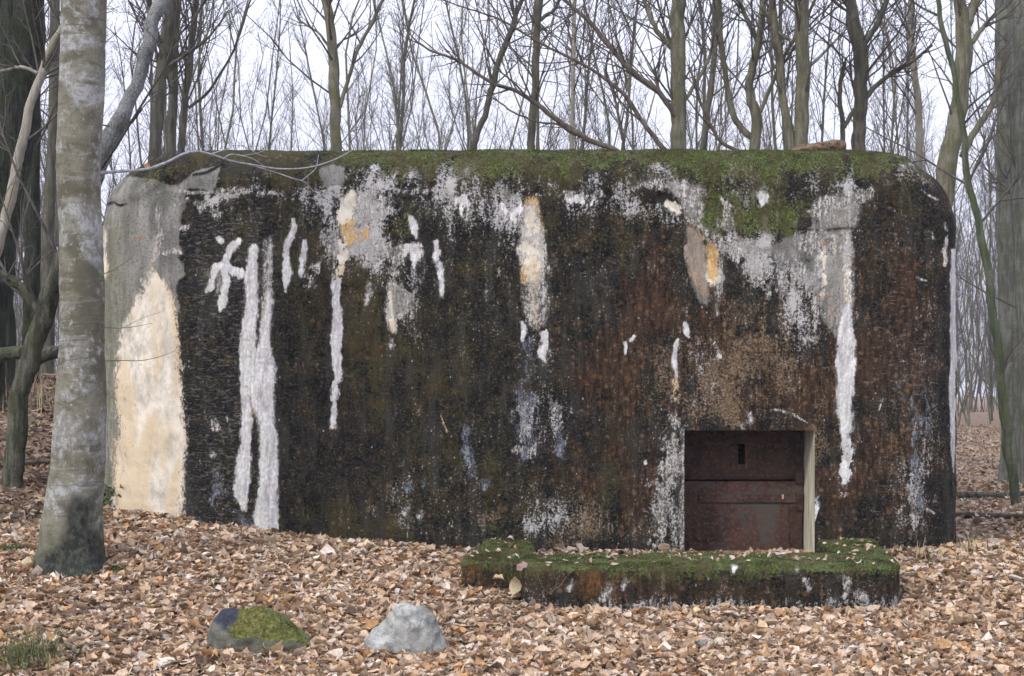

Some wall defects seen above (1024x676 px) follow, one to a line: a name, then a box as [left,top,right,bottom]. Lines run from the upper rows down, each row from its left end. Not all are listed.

leakage [187,187,277,218]
leakage [563,190,627,209]
spalling [664,200,682,215]
spalling [684,224,710,301]
peeling [108,267,188,517]
leakage [205,187,472,530]
leakage [510,337,538,460]
leakage [637,178,874,498]
leakage [461,424,489,491]
leakage [555,429,567,458]
leakage [644,414,684,550]